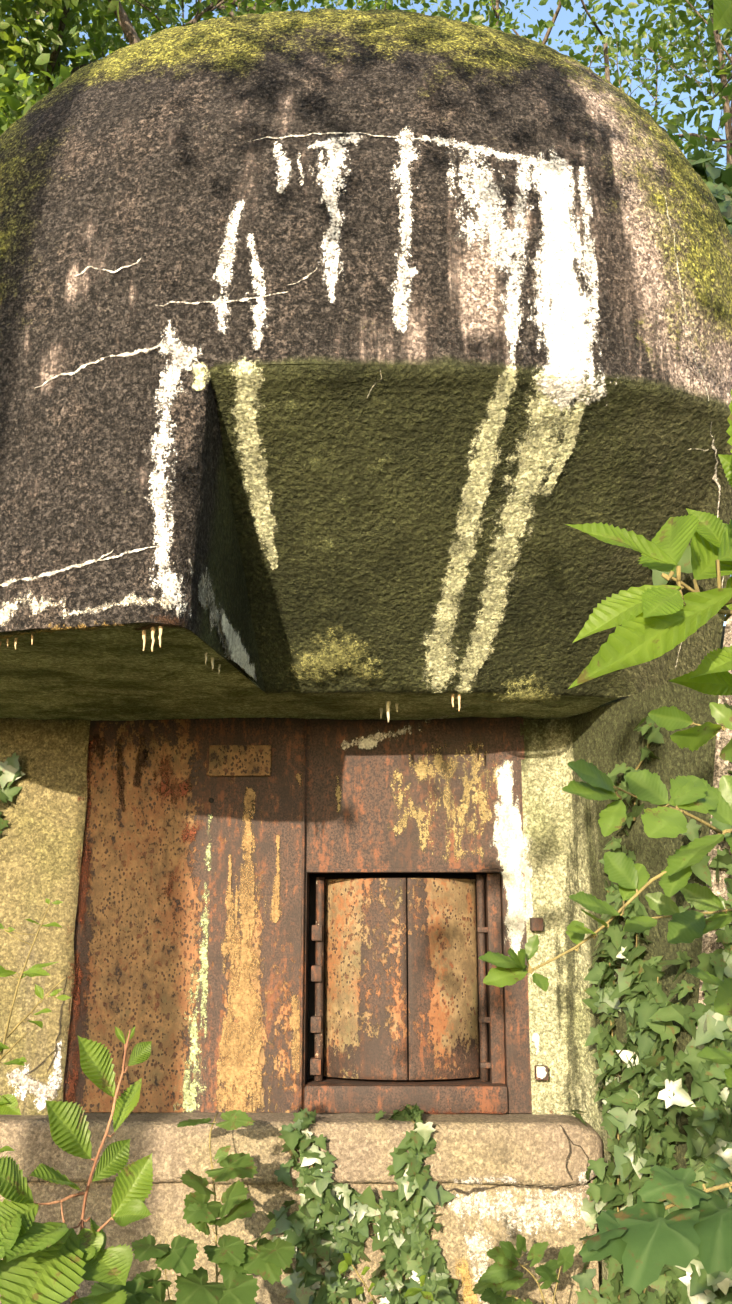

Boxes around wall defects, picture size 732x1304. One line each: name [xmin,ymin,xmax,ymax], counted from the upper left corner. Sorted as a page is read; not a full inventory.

crack [75,258,141,276]
crack [35,343,205,388]
efflorescence [118,324,210,616]
crack [158,268,317,306]
efflorescence [213,200,278,570]
efflorescence [273,134,362,303]
efflorescence [341,127,606,749]
efflorescence [0,594,86,625]
corrosion [73,734,192,931]
peeling [388,743,499,861]
efflorescence [493,761,534,954]
corrosion [62,946,90,1104]